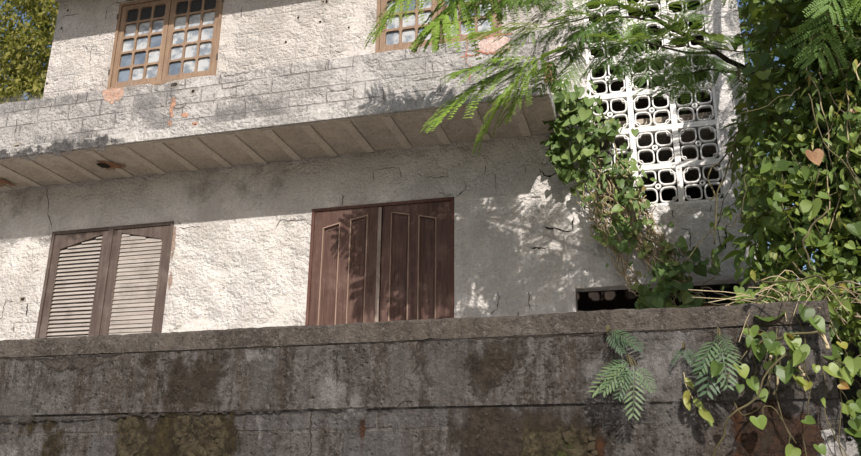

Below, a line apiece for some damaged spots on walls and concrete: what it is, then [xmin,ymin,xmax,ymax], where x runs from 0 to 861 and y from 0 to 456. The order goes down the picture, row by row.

spalling [102,87,124,104]
spalling [168,81,198,126]
water stain [0,130,123,161]
crack [532,218,574,249]
water stain [170,411,231,456]
rust [725,400,825,456]